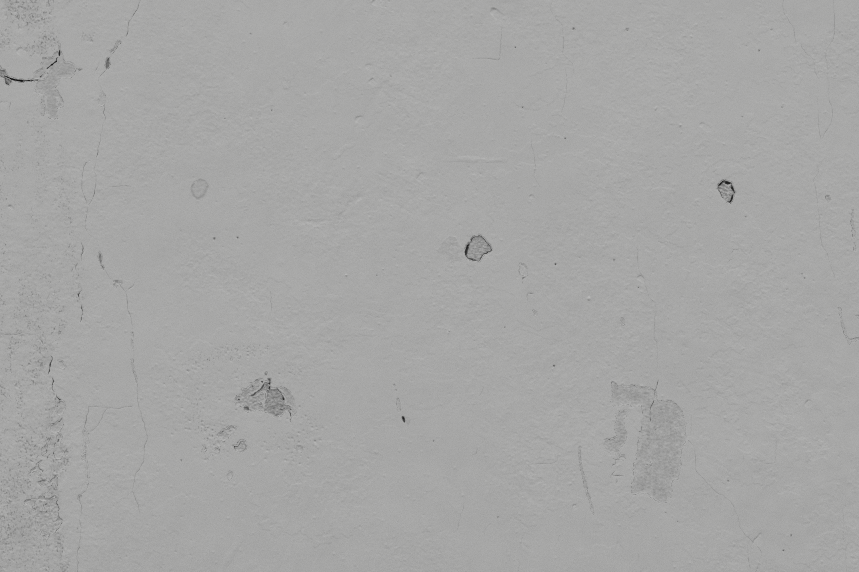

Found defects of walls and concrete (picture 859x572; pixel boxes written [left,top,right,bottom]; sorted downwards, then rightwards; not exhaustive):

crack [0,5,139,217]
spalling [464,234,493,262]
spalling [717,179,736,203]
crack [72,243,147,572]
spalling [234,371,296,422]
peeling [604,382,687,504]